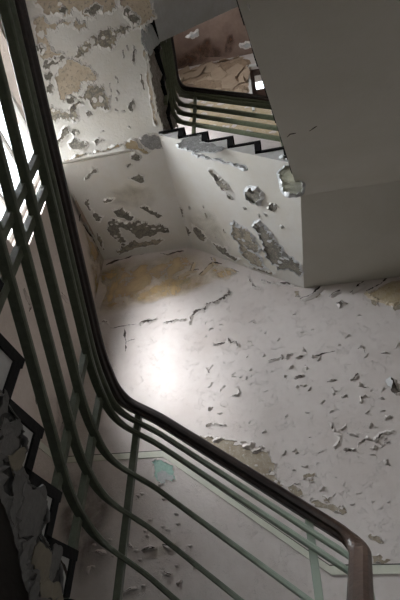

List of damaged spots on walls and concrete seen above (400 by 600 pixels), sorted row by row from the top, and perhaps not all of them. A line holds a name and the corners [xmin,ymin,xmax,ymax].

peeling [31,0,179,184]
peeling [178,41,251,93]
peeling [176,134,248,200]
peeling [276,155,306,198]
peeling [83,197,171,256]
peeling [178,185,304,297]
peeling [137,287,233,326]
peeling [364,280,400,311]
peeling [280,347,321,391]
peeling [379,377,400,400]
peeling [0,389,64,600]
peeling [199,434,316,497]